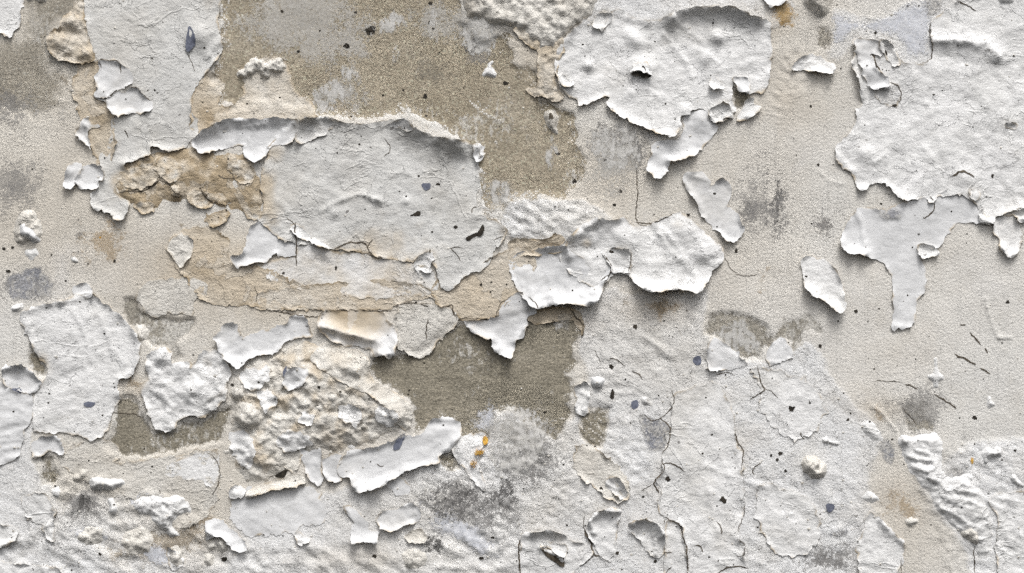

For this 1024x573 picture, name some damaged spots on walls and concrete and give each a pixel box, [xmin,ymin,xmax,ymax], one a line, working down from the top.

peeling [835,0,1024,332]
peeling [0,0,788,561]
peeling [800,256,858,313]
crack [643,390,685,493]
crack [735,434,762,474]
crack [583,516,611,564]
crack [664,505,749,573]